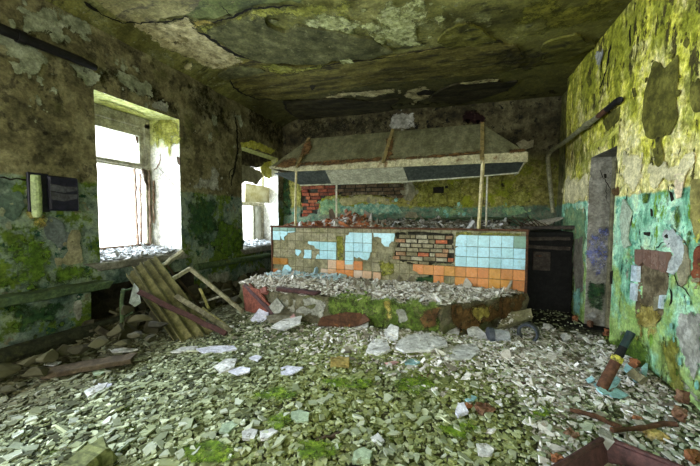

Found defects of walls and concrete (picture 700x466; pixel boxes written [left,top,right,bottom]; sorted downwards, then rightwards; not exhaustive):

peeling [8,0,94,44]
crack [84,2,298,59]
peeling [0,35,58,95]
peeling [70,63,103,88]
peeling [97,0,522,131]
peeling [603,106,622,131]
crack [229,111,243,187]
peeling [611,53,700,324]
spalling [375,230,455,266]
spalling [669,300,700,390]